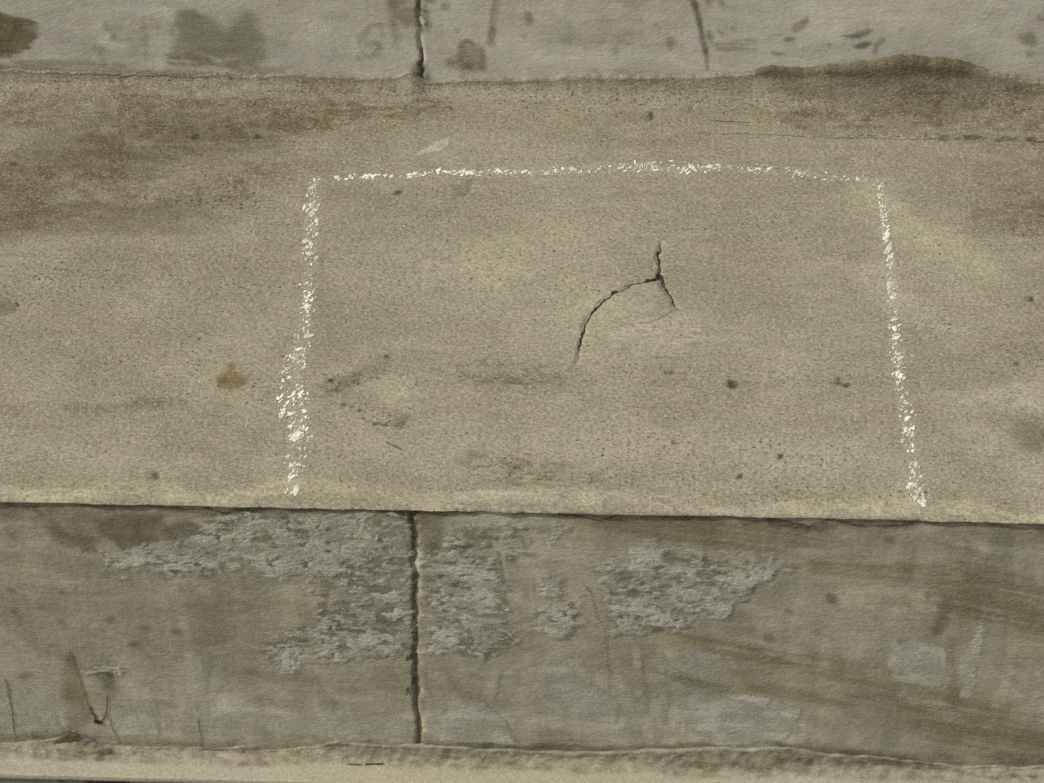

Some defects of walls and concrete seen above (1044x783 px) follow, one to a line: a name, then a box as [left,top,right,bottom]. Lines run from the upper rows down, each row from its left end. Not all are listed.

crack [577,245,676,363]
crack [410,511,420,741]